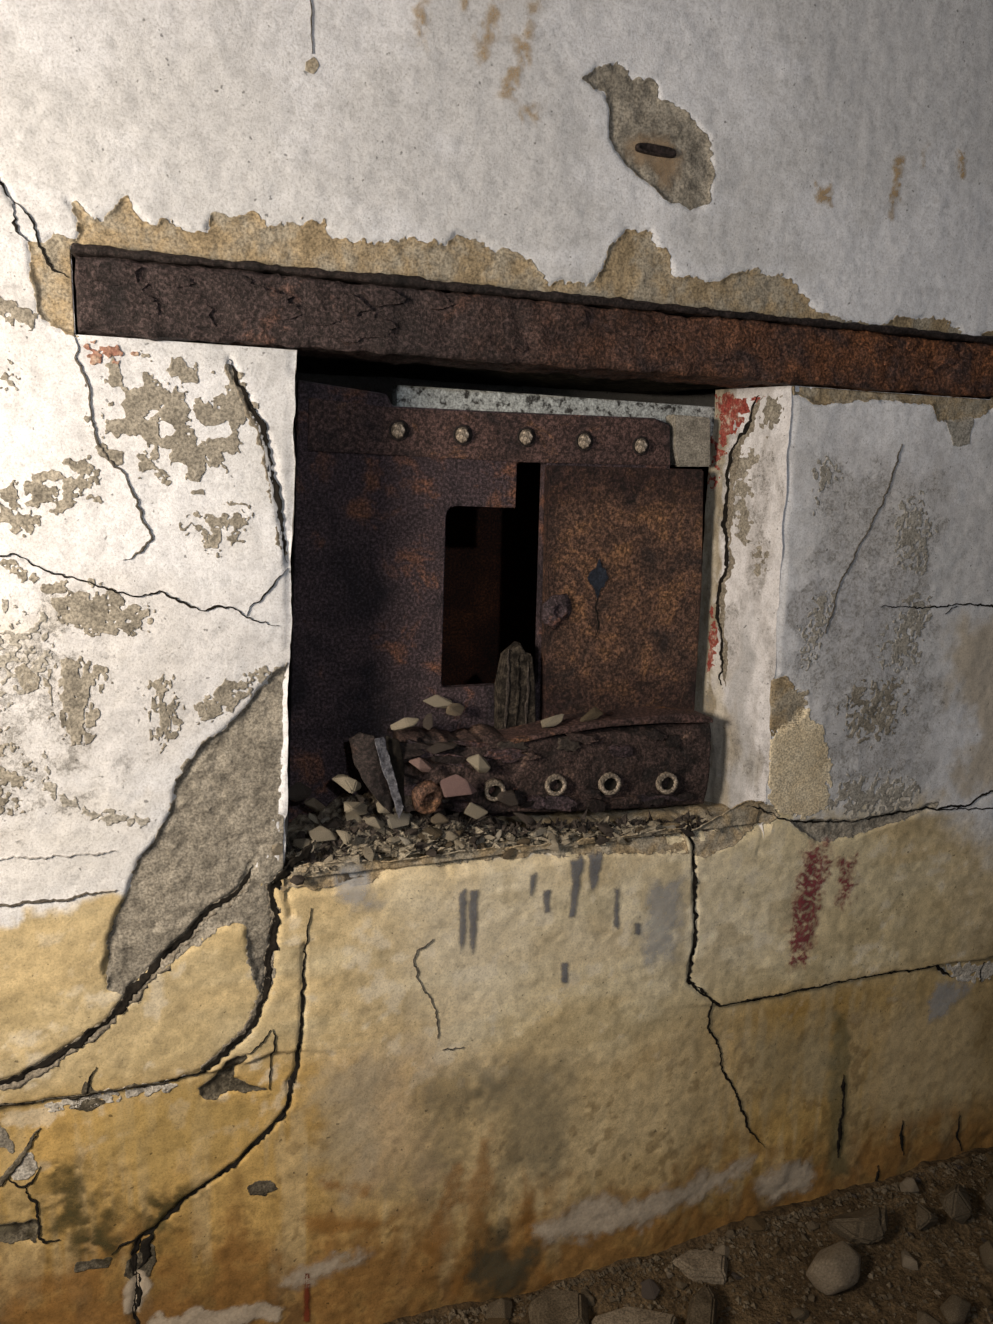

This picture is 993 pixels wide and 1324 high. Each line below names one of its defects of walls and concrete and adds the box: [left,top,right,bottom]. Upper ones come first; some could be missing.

spalling [582,62,716,210]
crack [0,335,288,626]
spalling [0,195,962,538]
crack [715,395,764,686]
spalling [708,386,993,577]
crack [0,840,316,1324]
water stain [123,1270,282,1324]
water stain [459,889,478,952]
spalling [0,558,939,996]
water stain [569,852,602,917]
water stain [464,1157,813,1296]
crack [686,821,985,1158]